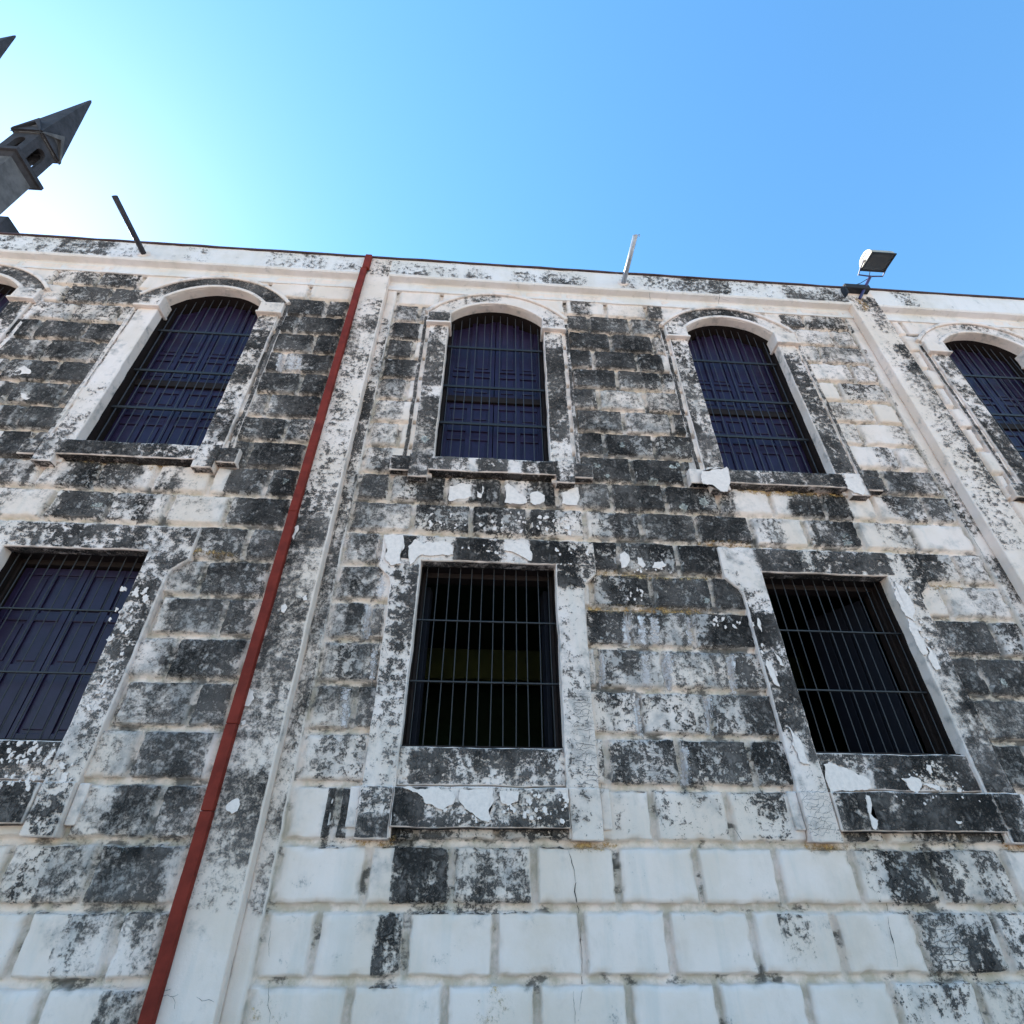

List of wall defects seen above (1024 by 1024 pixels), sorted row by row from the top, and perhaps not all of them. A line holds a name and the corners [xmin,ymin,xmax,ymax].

damp [0,235,140,257]
damp [266,252,326,268]
damp [338,257,491,279]
peeling [424,483,484,529]
peeling [479,483,589,565]
peeling [384,534,470,565]
damp [0,266,1024,1024]
peeling [403,786,569,825]
peeling [824,762,878,830]
peeling [895,765,944,805]